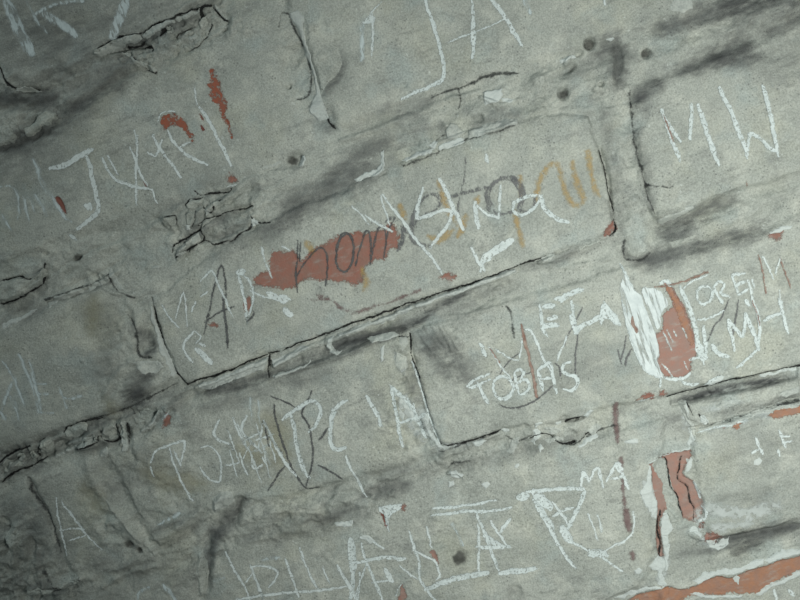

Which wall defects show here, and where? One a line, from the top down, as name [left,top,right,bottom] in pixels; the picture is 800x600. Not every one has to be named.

peeling [93,10,208,73]
crack [629,94,673,212]
peeling [162,198,221,256]
crack [65,389,164,450]
crack [176,253,553,385]
crack [398,333,615,464]
spalling [656,283,697,378]
crack [667,364,800,425]
peeling [759,368,796,377]
crack [0,438,60,547]
spalling [614,386,800,600]